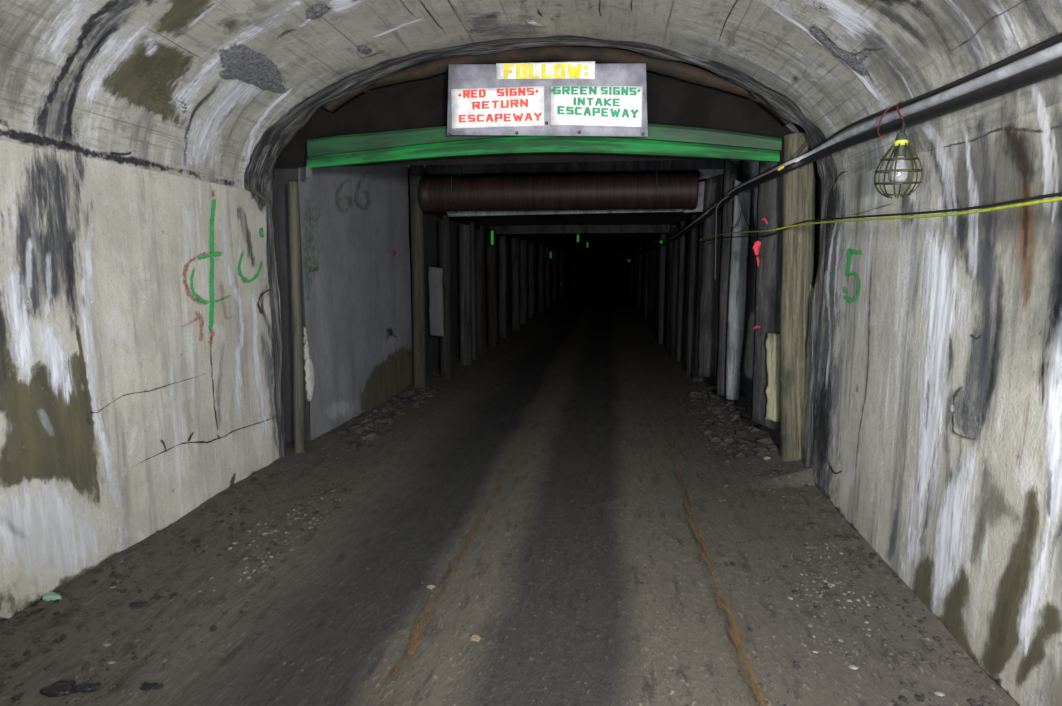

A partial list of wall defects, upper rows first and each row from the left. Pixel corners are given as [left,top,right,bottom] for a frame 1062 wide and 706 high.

water stain [38,0,301,165]
spalling [219,43,285,94]
water stain [775,8,883,100]
water stain [809,0,926,48]
corrosion [1006,127,1034,306]
water stain [0,242,115,592]
crack [91,351,270,463]
water stain [901,128,1062,706]